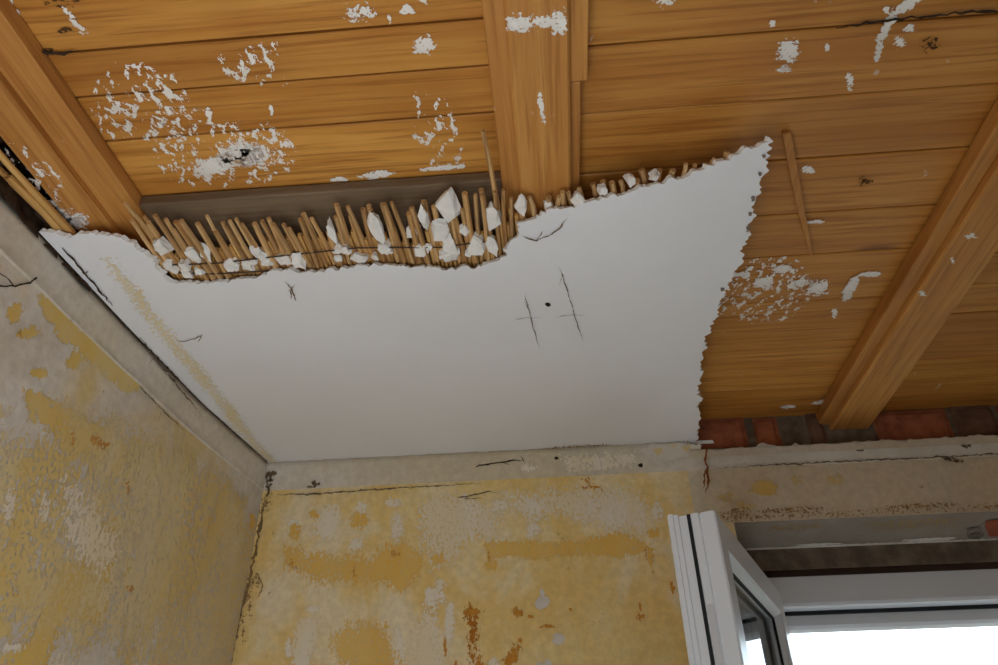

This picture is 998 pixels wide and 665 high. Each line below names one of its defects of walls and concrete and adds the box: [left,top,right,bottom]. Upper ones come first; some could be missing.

flaking render [0,136,91,292]
peeling [3,292,143,396]
peeling [21,368,113,455]
rust [443,602,523,665]